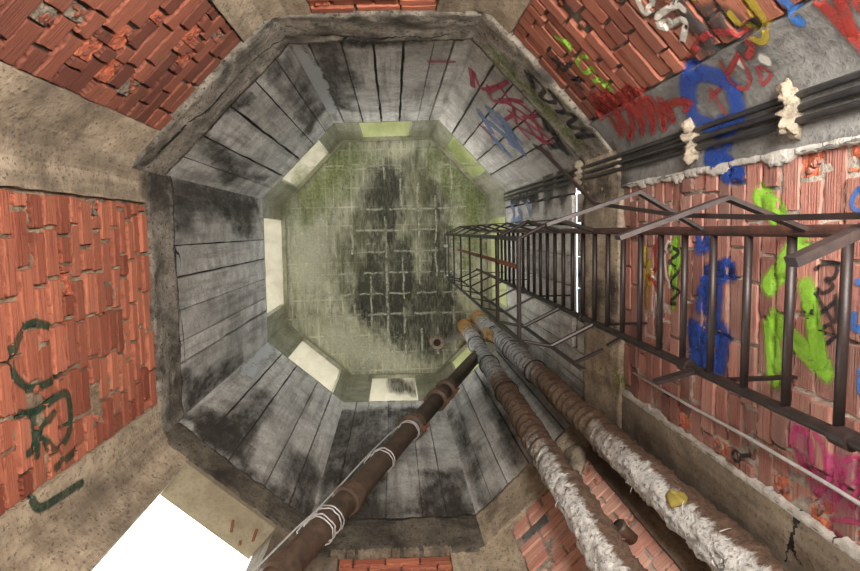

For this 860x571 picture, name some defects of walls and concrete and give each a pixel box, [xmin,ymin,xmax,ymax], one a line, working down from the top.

spalling [74,24,135,83]
spalling [149,9,166,26]
spalling [176,24,202,67]
flaking render [627,135,860,189]
water stain [293,150,480,396]
water stain [182,361,268,477]
water stain [267,407,417,517]
water stain [347,415,480,519]
crack [784,509,807,565]